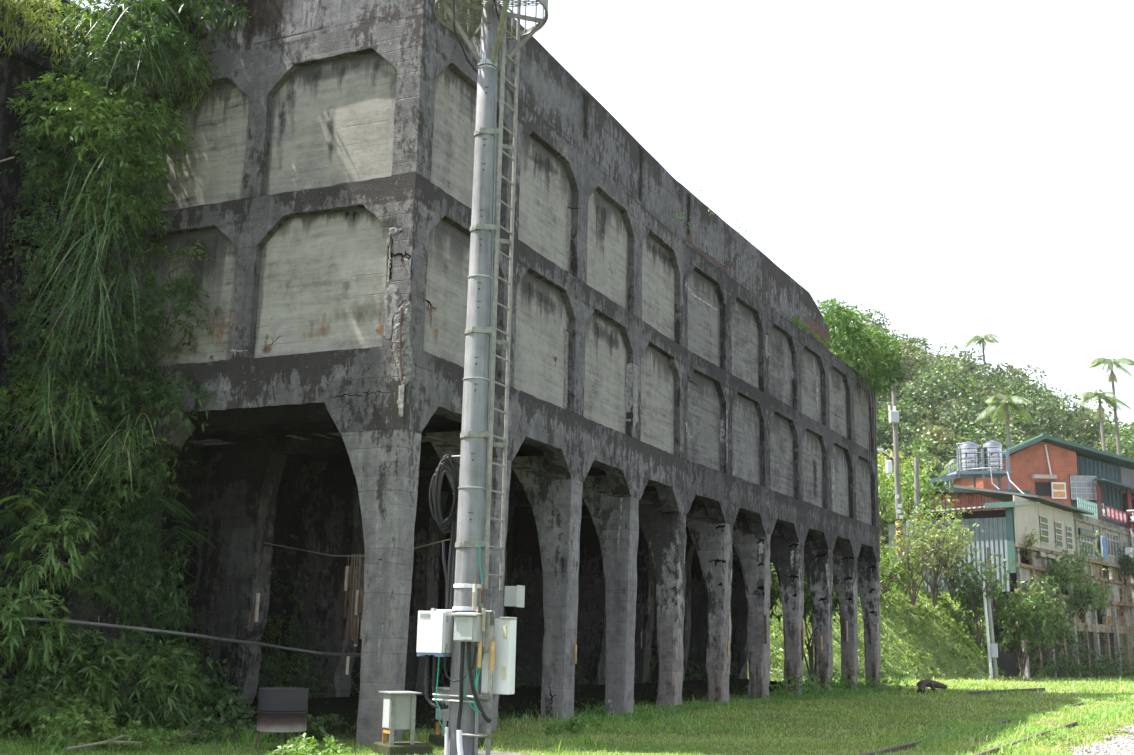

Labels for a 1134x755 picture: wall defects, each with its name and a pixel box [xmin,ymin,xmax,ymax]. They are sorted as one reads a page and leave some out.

spalling [383,226,412,417]
crack [388,237,411,283]